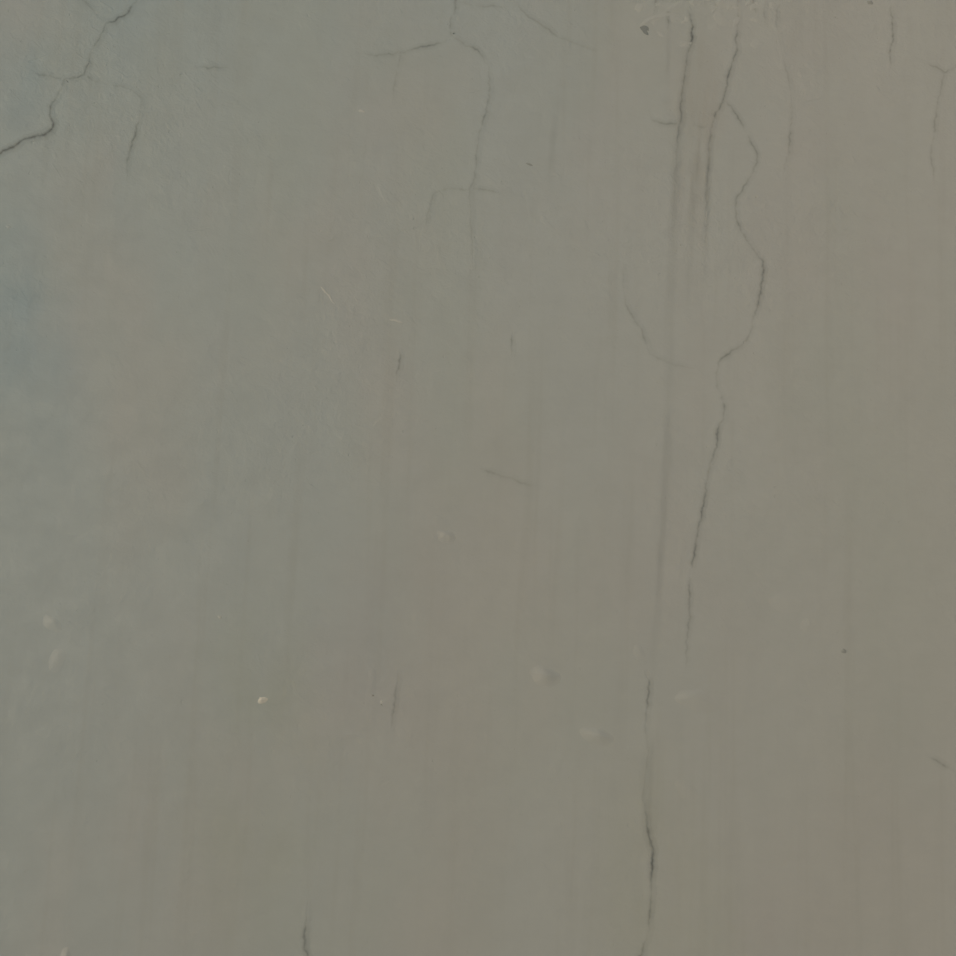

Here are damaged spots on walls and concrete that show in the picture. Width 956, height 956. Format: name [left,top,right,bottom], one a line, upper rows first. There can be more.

crack [0,0,146,179]
crack [646,0,769,675]
crack [299,900,313,956]
crack [634,669,659,956]